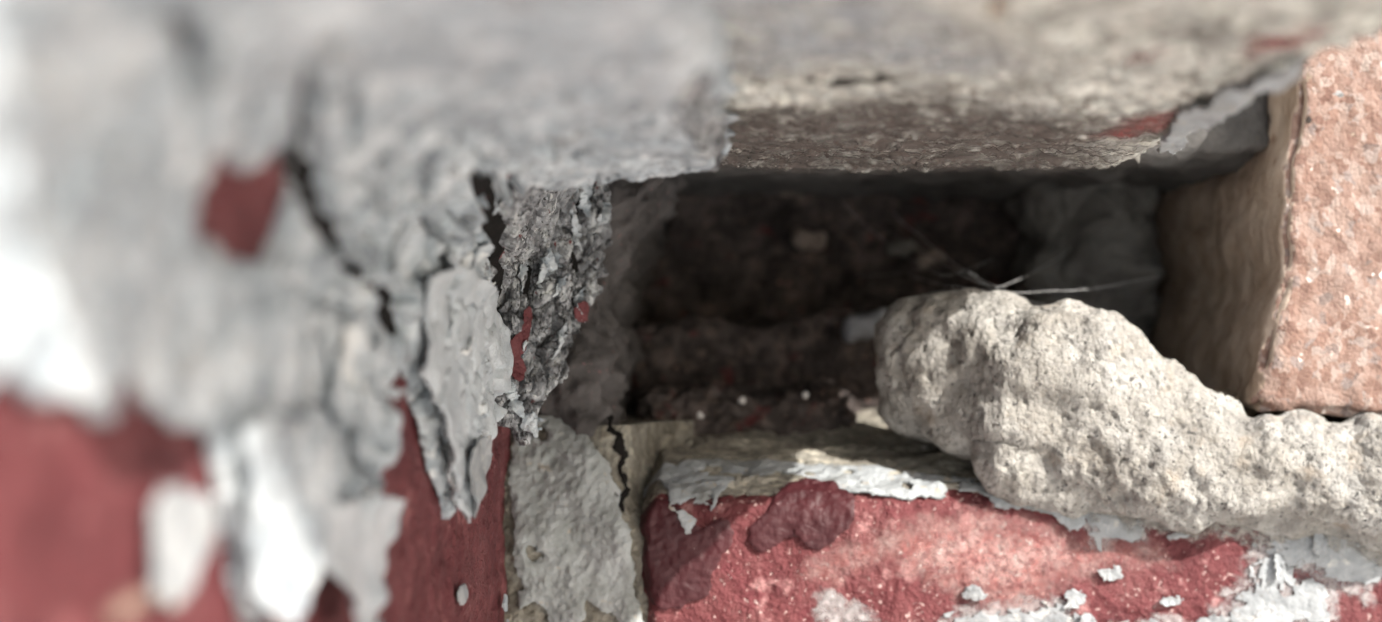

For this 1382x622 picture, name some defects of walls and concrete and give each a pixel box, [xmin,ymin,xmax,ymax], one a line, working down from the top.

crack [277,67,397,336]
peeling [0,0,739,622]
crack [468,169,532,320]
crack [567,197,580,346]
crack [606,415,631,512]
peeling [643,458,1146,622]
peeling [1123,532,1382,622]